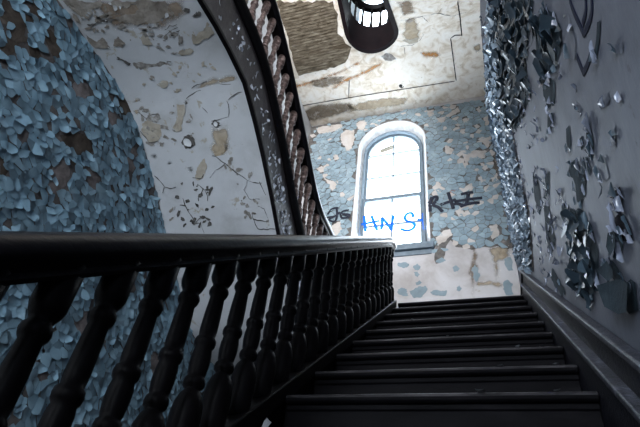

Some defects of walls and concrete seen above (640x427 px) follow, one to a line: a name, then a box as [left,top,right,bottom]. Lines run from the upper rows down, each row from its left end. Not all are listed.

peeling [0,0,215,233]
crack [186,81,241,121]
crack [155,155,273,232]
peeling [261,108,292,235]
spalling [277,0,351,76]
peeling [308,0,639,314]
peeling [0,283,37,365]
peeling [7,276,102,427]
peeling [71,271,149,427]
peeling [121,279,181,427]
peeling [163,328,195,424]
peeling [200,361,215,396]